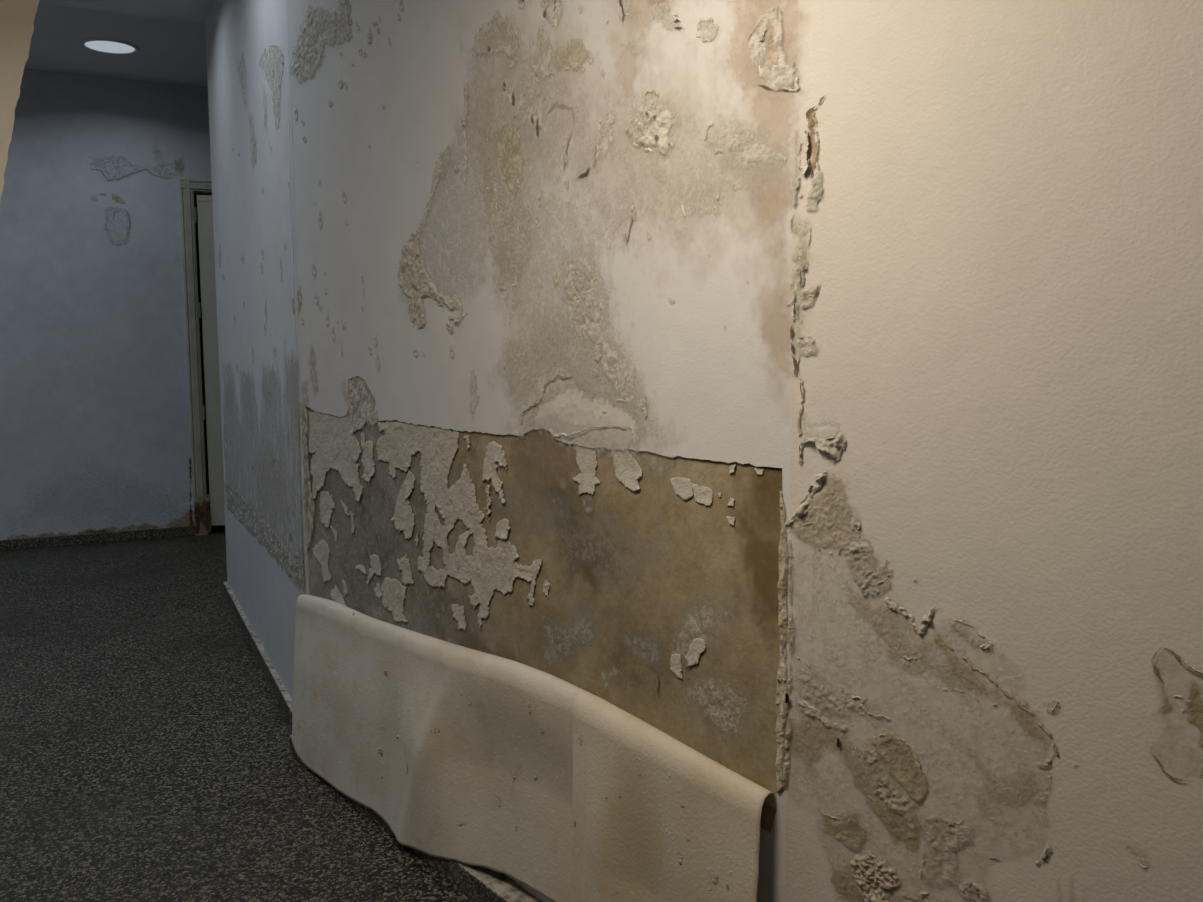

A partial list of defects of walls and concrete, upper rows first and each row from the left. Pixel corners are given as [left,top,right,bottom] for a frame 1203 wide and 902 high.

damp [731,13,797,139]
flaking render [748,6,800,92]
damp [479,138,647,425]
damp [223,346,318,574]
spalling [304,376,1060,902]
damp [657,588,749,742]